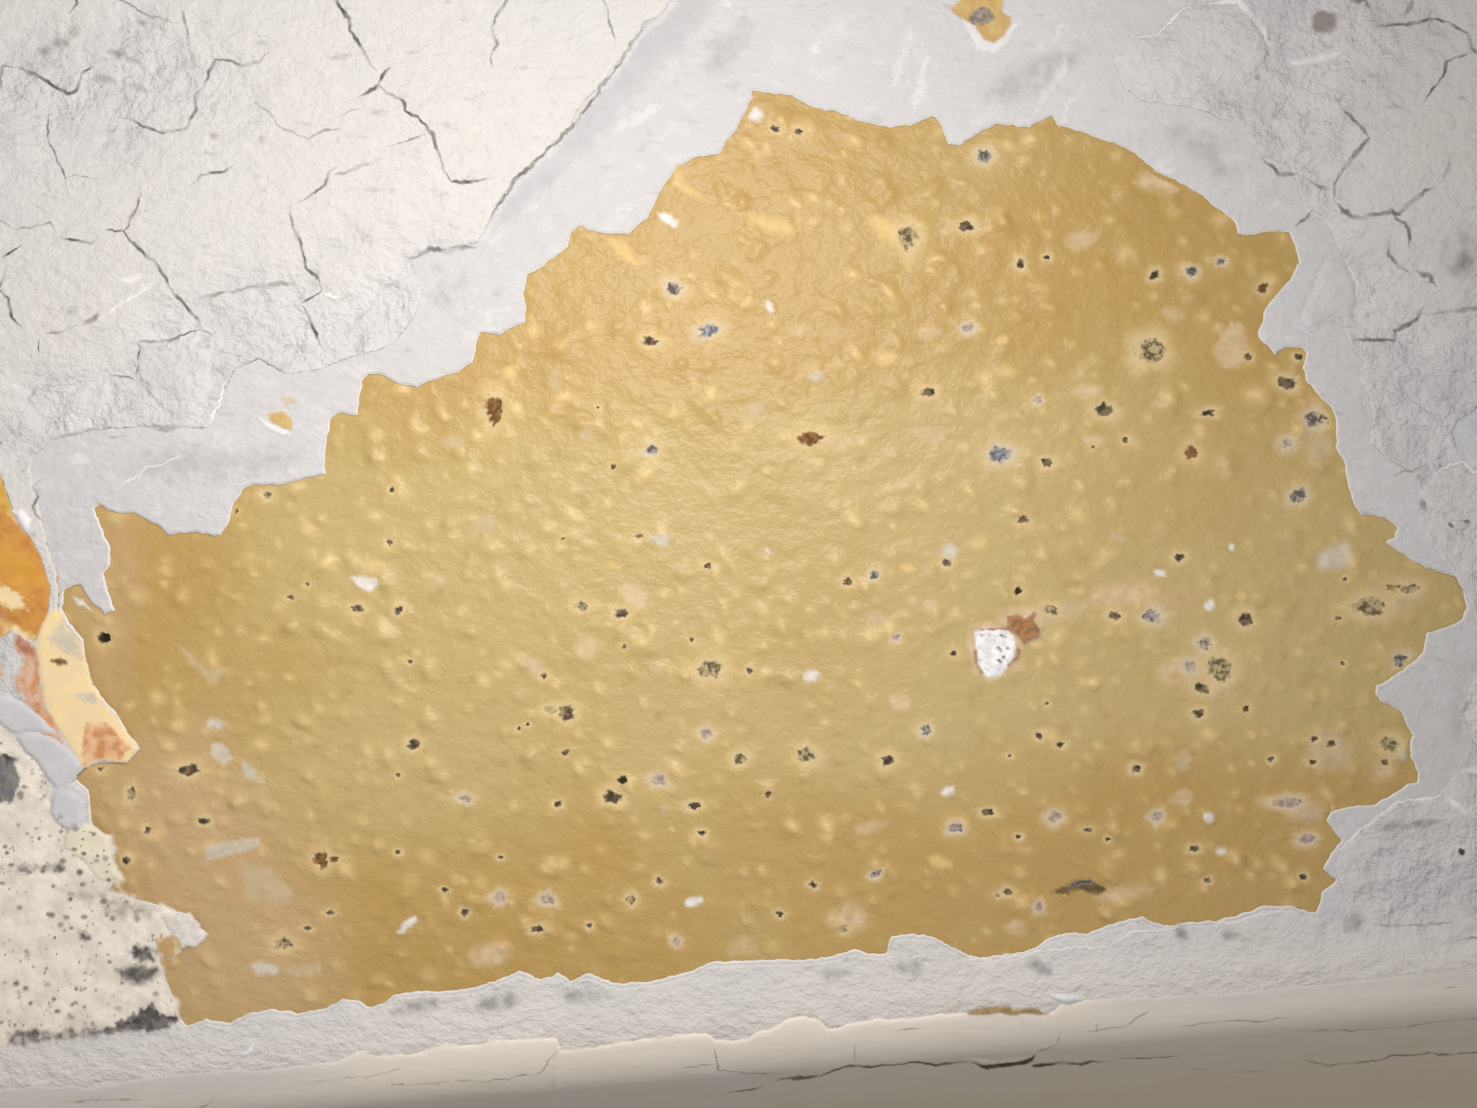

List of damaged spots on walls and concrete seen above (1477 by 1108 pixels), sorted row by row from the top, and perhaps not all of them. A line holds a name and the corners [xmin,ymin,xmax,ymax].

crack [0,64,91,178]
crack [0,173,345,379]
crack [336,0,631,212]
crack [1264,111,1477,312]
peeling [31,0,1454,769]
peeling [12,509,31,531]
corrosion [0,477,62,744]
leakage [0,742,46,803]
leakage [0,818,179,1045]
spalling [0,691,207,1048]
peeling [177,590,1477,1029]
crack [258,972,1477,1093]